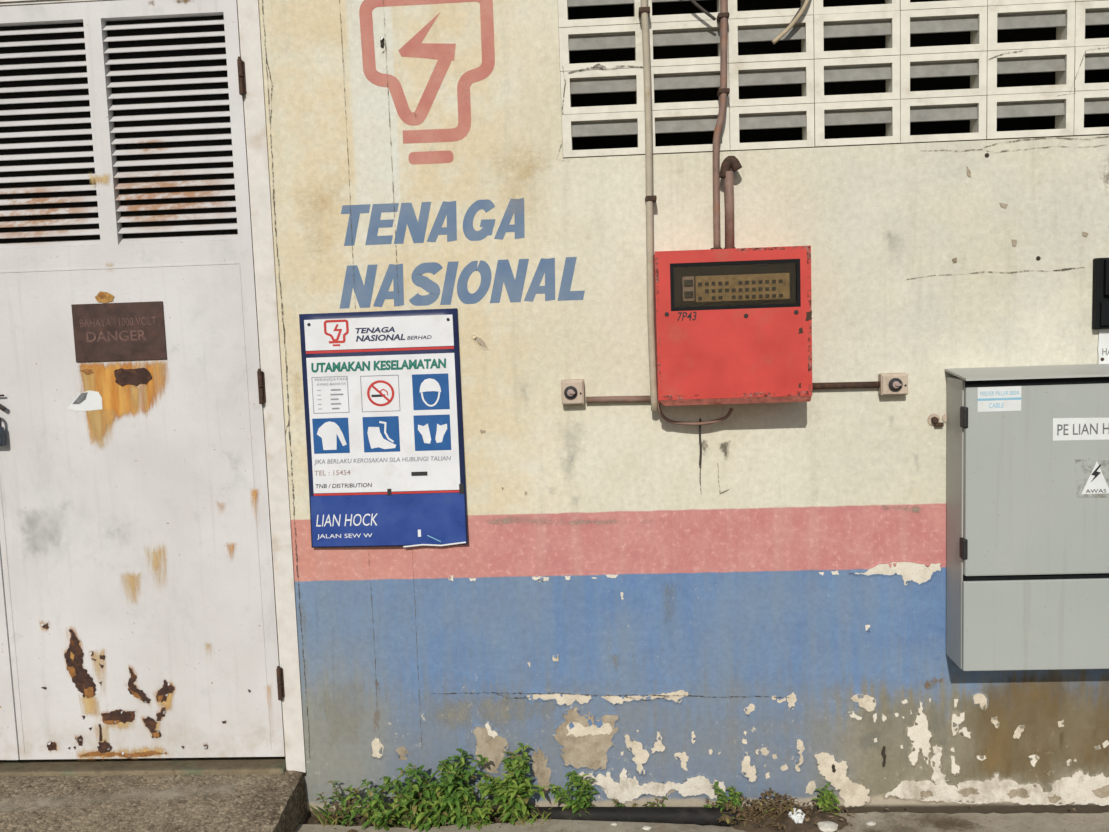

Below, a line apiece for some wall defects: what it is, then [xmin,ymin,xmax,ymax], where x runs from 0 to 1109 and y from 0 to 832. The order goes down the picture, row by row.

corrosion [79,362,165,446]
peeling [819,559,944,588]
corrosion [47,629,174,758]
peeling [470,720,511,776]
peeling [521,687,728,805]
peeling [738,691,1109,810]
damp [981,678,1065,775]